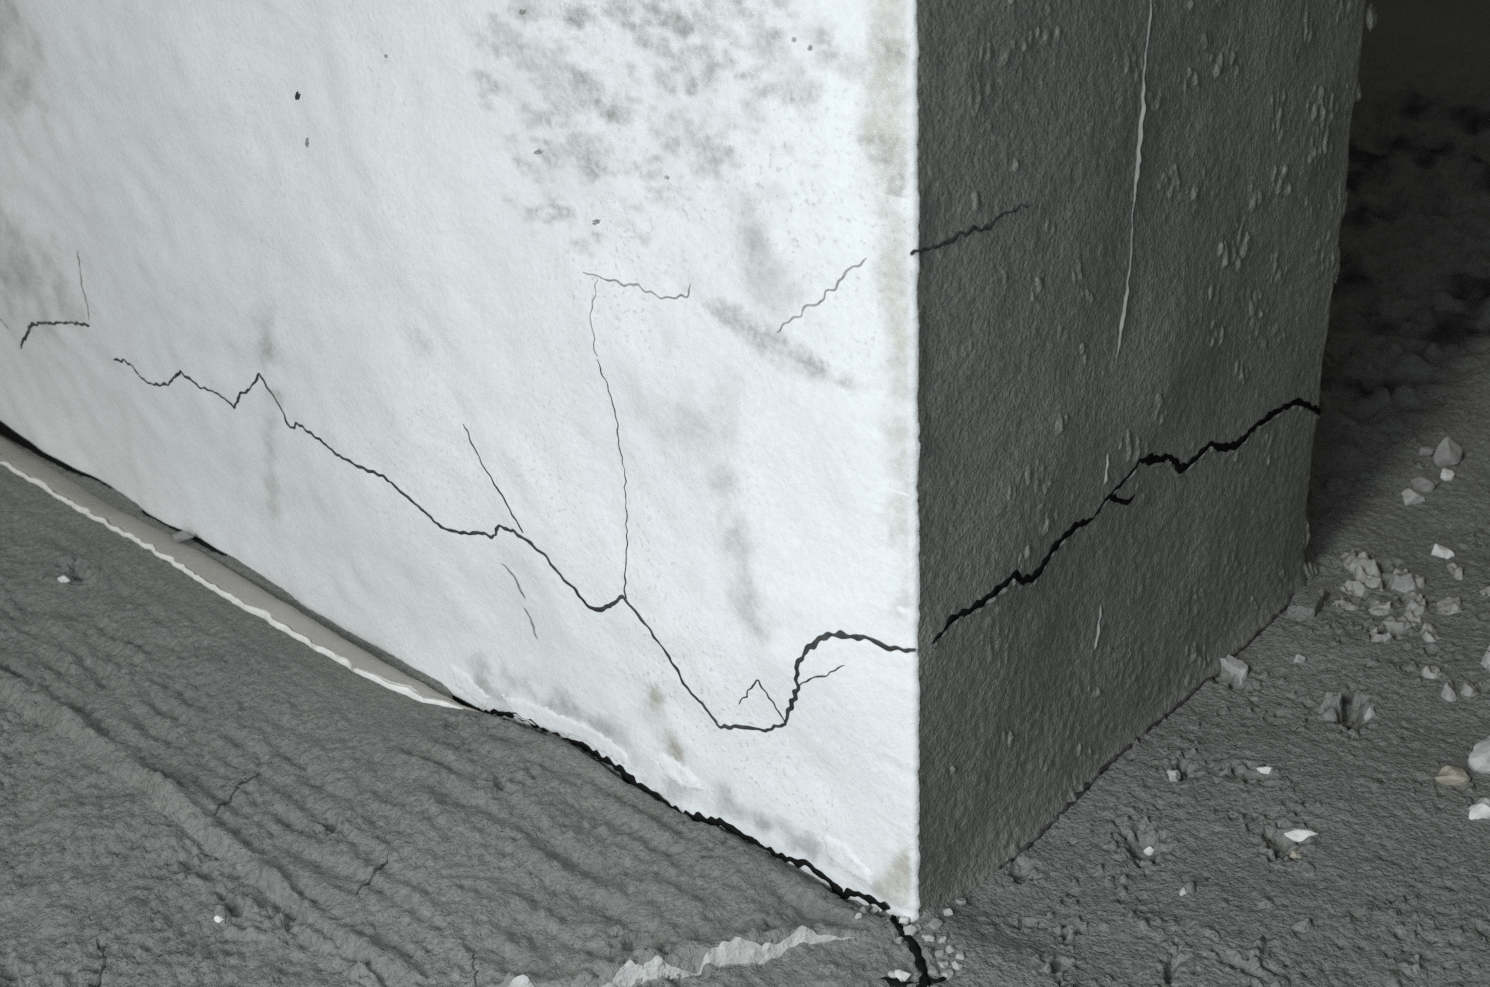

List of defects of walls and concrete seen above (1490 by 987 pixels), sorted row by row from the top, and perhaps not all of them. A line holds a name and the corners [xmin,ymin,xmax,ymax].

crack [910,203,1032,256]
crack [0,251,90,349]
crack [776,257,867,333]
crack [113,272,1321,733]
spalling [52,553,101,589]
crack [476,707,947,987]
spalling [508,974,534,987]
spalling [602,926,852,987]